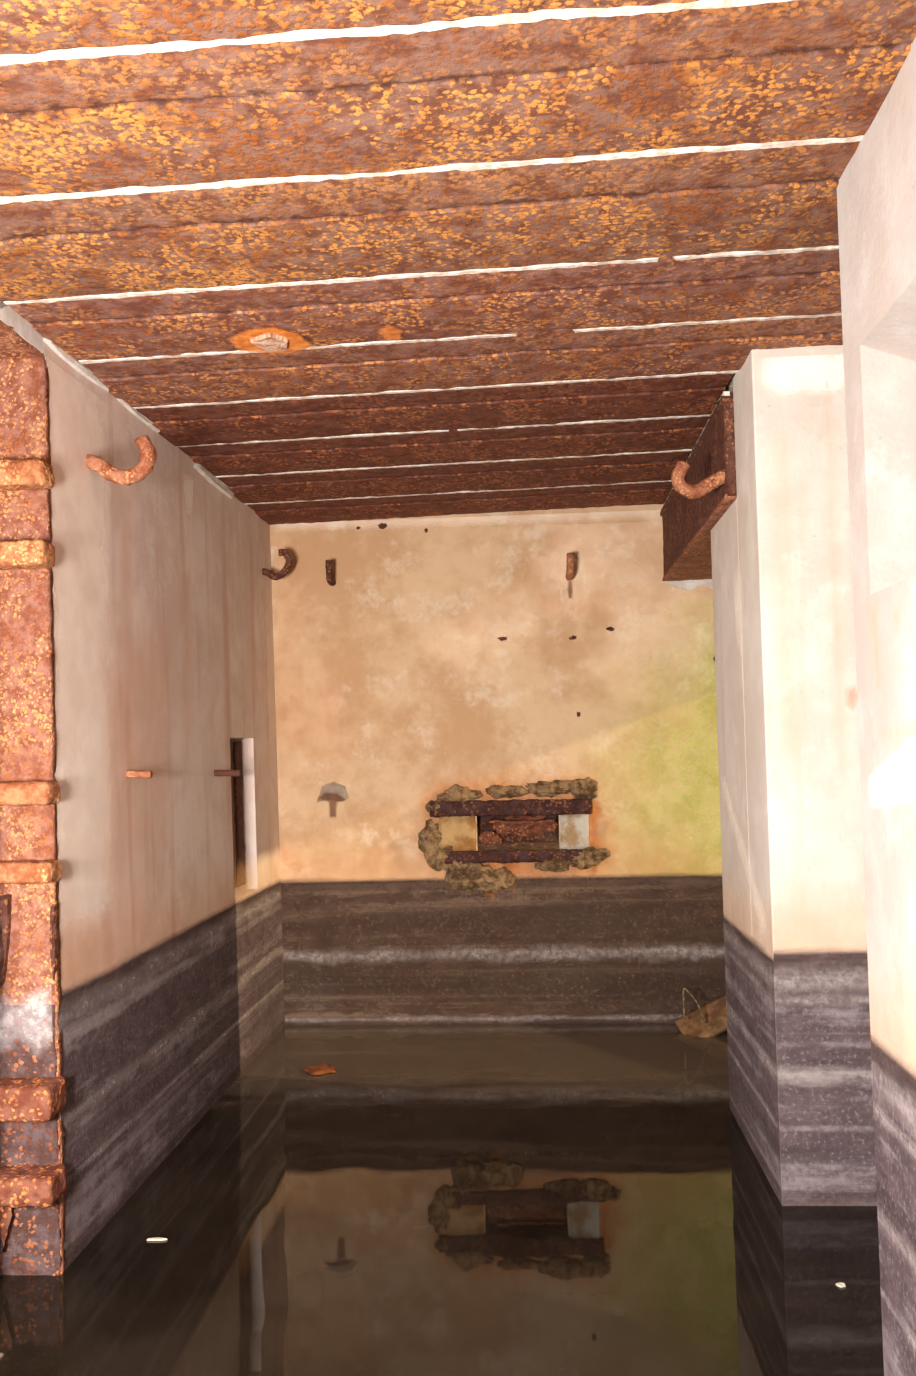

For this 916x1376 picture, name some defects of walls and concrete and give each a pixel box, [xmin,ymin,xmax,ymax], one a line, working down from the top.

corrosion [230,327,312,353]
corrosion [378,325,402,341]
corrosion [0,894,12,988]
corrosion [49,904,57,981]
corrosion [0,1207,16,1253]